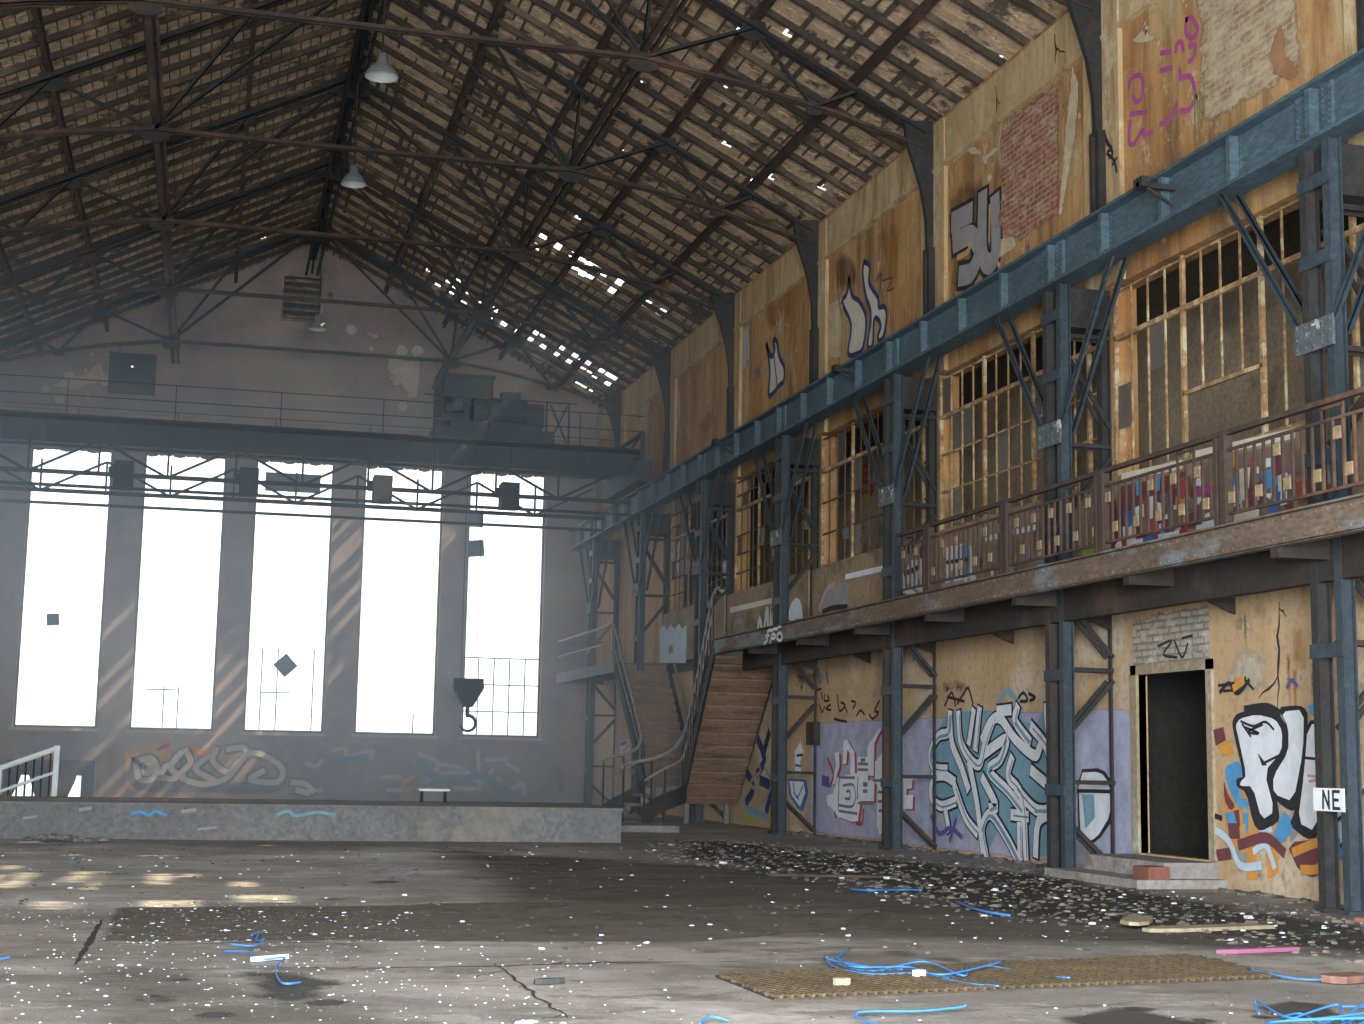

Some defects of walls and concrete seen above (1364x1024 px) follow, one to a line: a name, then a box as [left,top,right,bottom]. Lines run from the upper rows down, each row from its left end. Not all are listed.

spalling [1182,0,1299,120]
crack [299,942,402,969]
crack [442,961,646,1019]